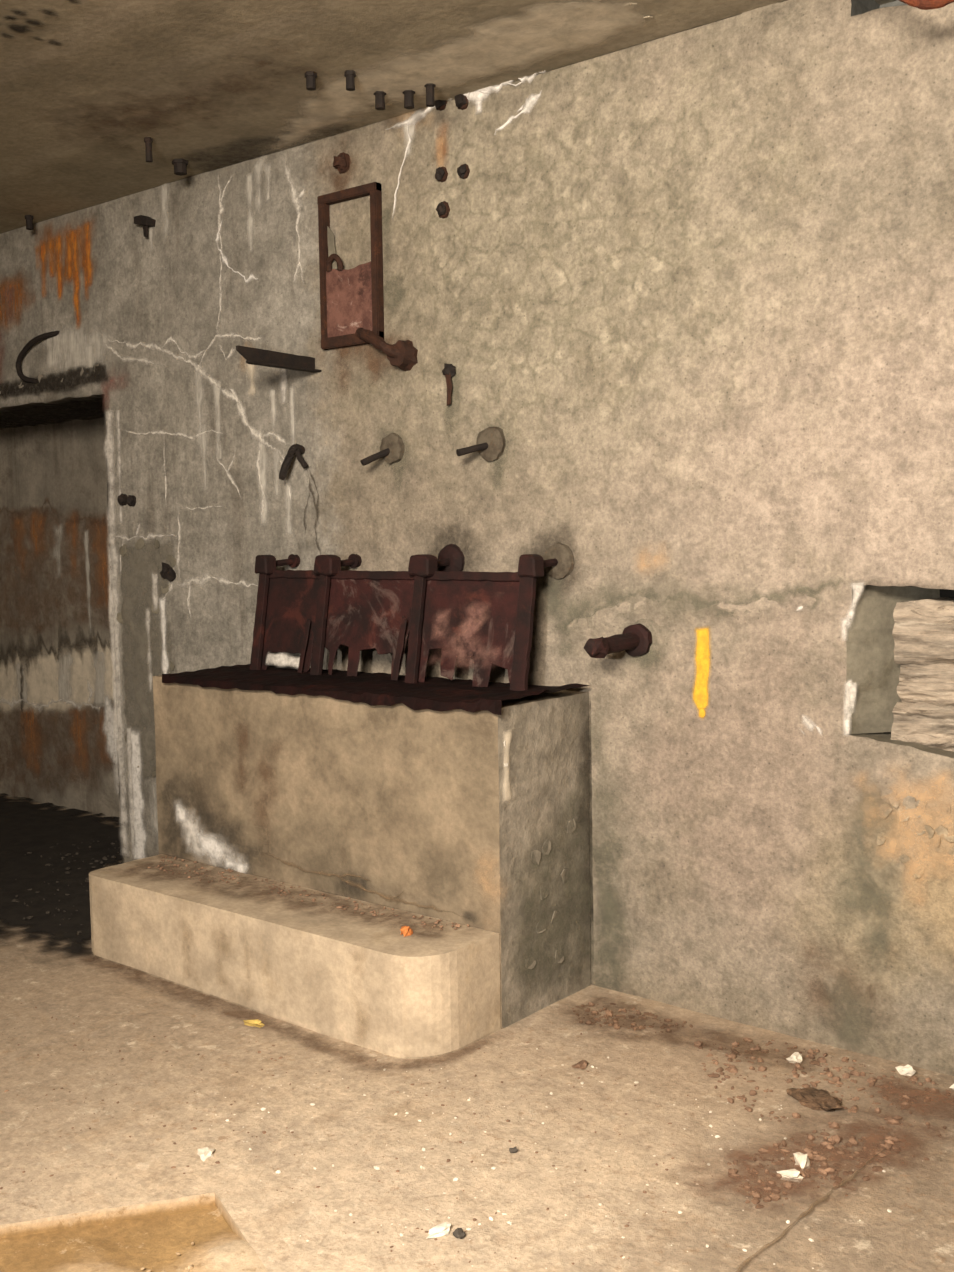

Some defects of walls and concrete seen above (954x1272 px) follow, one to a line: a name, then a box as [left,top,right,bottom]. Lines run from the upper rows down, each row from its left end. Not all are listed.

crack [393,106,435,210]
crack [463,73,540,129]
rust [40,224,92,323]
crack [83,166,319,618]
damp [0,410,249,873]
crack [736,1154,877,1272]